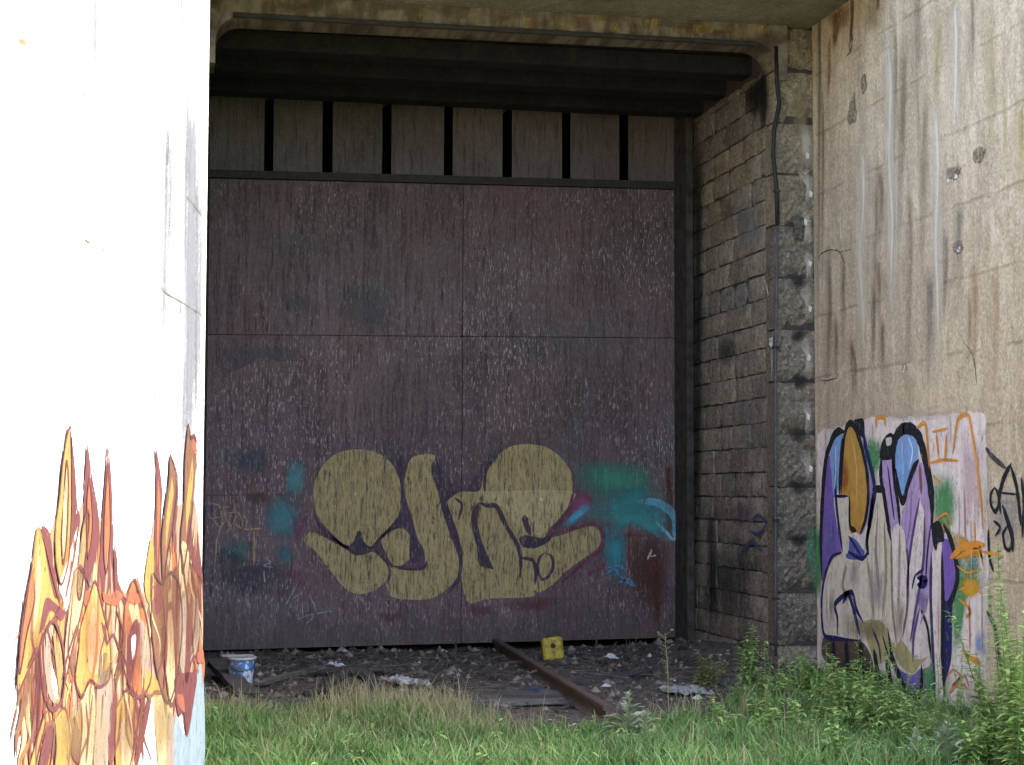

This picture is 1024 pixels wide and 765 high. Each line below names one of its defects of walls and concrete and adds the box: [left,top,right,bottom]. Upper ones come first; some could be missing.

damp [154,94,203,460]
spalling [848,74,867,124]
damp [851,154,867,335]
damp [885,52,894,293]
damp [932,108,940,328]
spalling [946,167,961,183]
spalling [973,147,986,163]